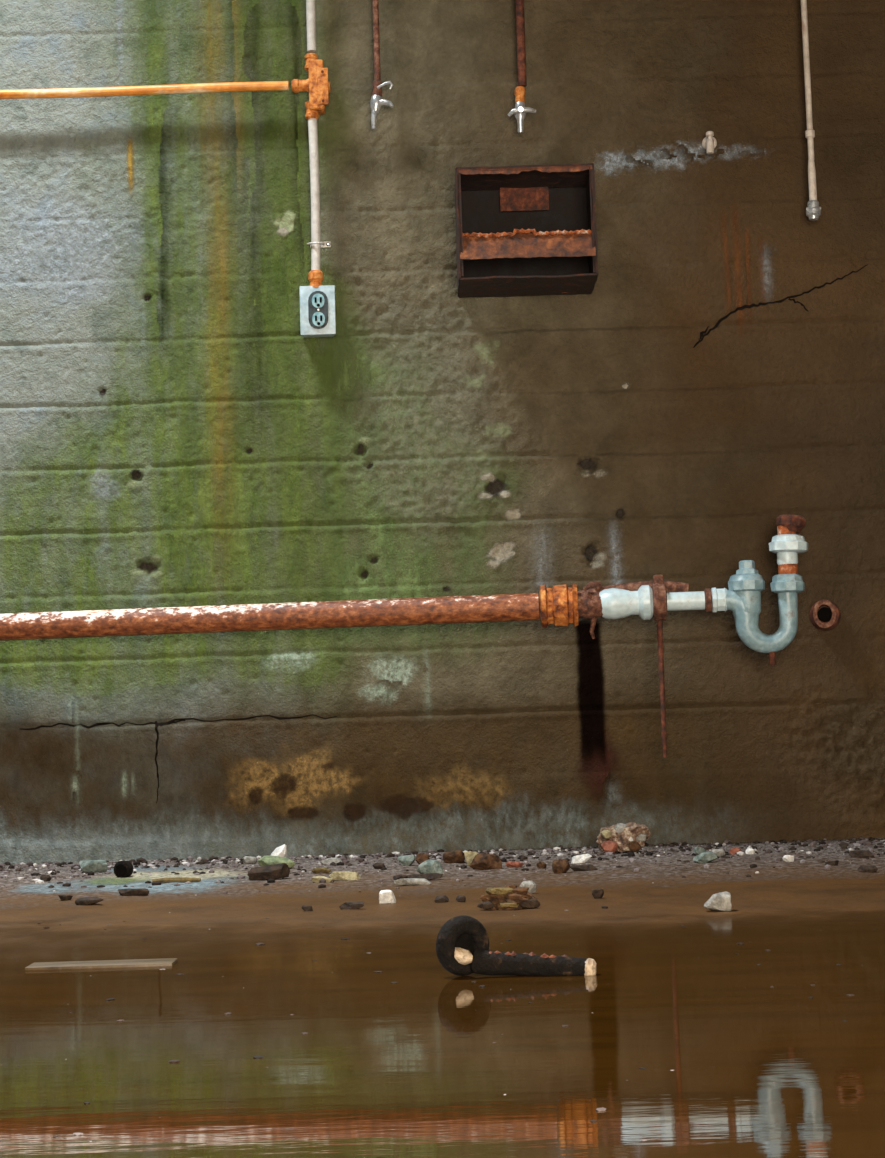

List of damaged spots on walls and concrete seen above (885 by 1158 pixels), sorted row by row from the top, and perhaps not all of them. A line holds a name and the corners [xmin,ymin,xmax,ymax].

leakage [146,0,184,356]
leakage [605,143,697,173]
leakage [0,216,113,295]
crack [693,264,868,348]
leakage [0,704,695,864]